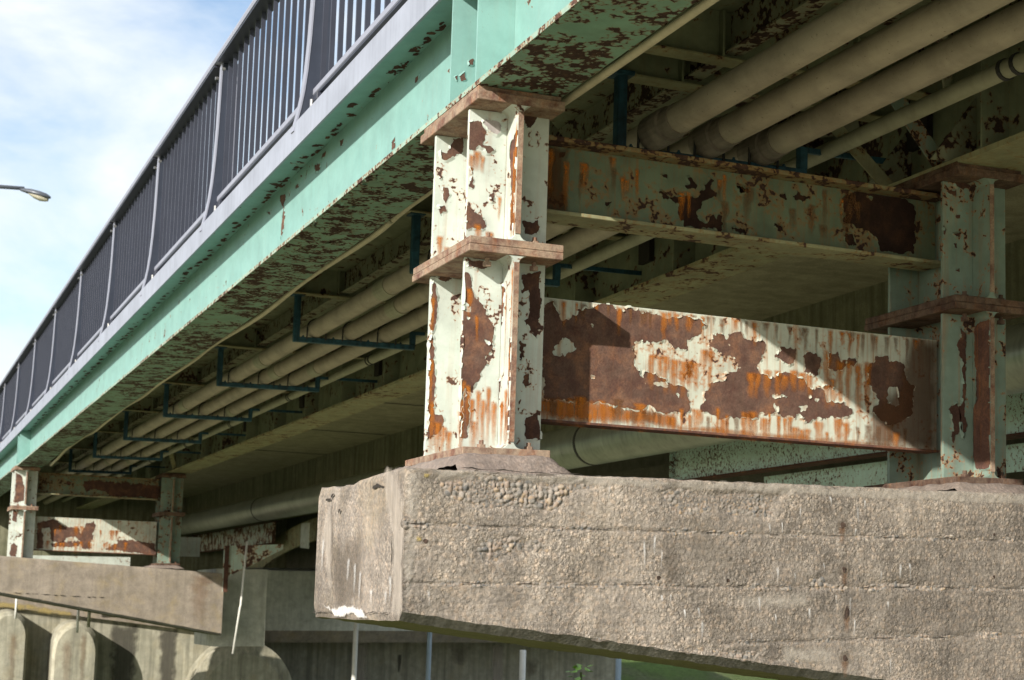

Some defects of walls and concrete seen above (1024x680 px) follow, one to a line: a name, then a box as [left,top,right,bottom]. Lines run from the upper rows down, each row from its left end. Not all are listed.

peeling [369,22,446,97]
peeling [481,117,504,137]
rust [659,174,752,235]
rust [840,191,917,255]
peeling [28,103,358,431]
rust [424,257,936,447]
rust [949,318,991,472]
rust [12,473,25,523]
rust [66,479,160,499]
rust [36,519,156,554]